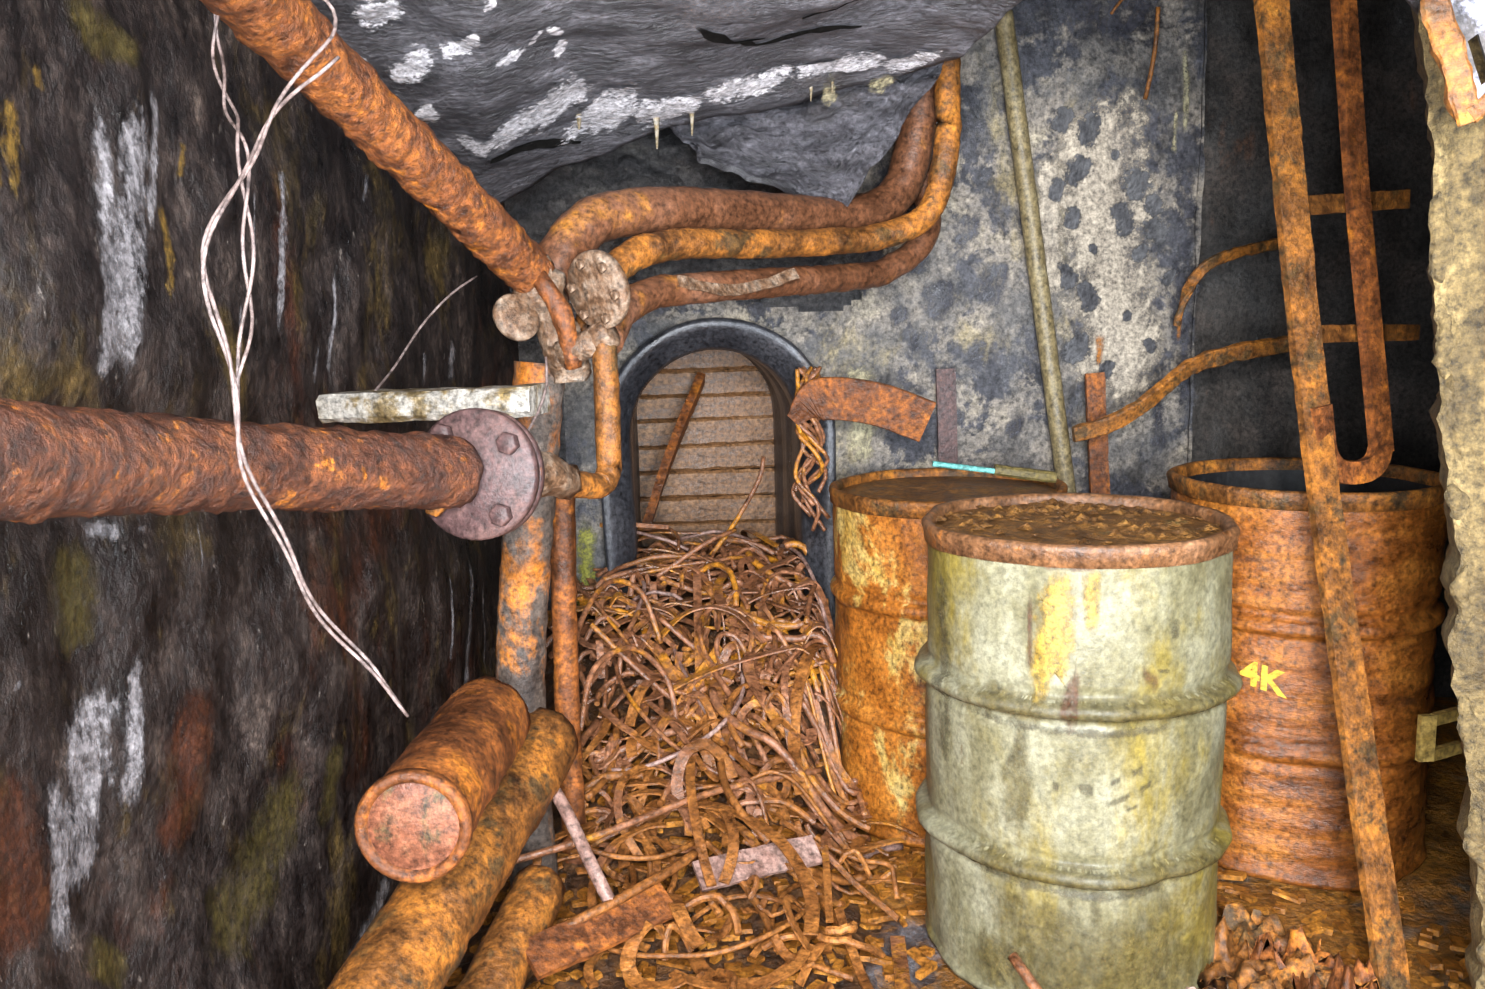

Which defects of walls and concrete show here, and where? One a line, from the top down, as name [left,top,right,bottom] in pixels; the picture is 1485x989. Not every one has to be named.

efflorescence [352,0,407,28]
leakage [483,0,497,12]
crack [696,0,862,47]
efflorescence [94,93,158,373]
leakage [950,213,980,249]
leakage [1149,52,1200,448]
leakage [975,263,1009,306]
leakage [891,255,954,353]
leakage [847,369,871,380]
leakage [849,422,872,459]
leakage [1005,417,1024,438]